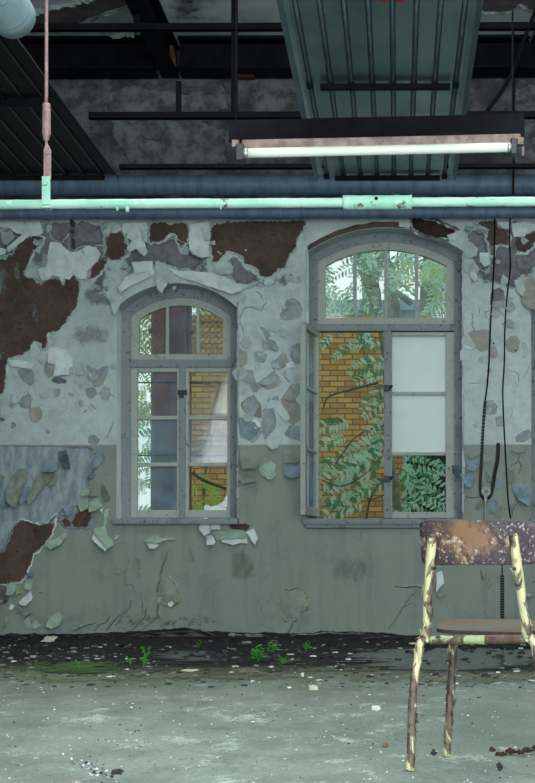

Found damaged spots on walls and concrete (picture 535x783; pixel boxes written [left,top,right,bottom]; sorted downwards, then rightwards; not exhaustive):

spalling [0,218,535,513]
peeling [0,435,119,610]
peeling [144,535,175,549]
peeling [199,518,258,545]
peeling [40,611,62,642]
crack [71,595,159,632]